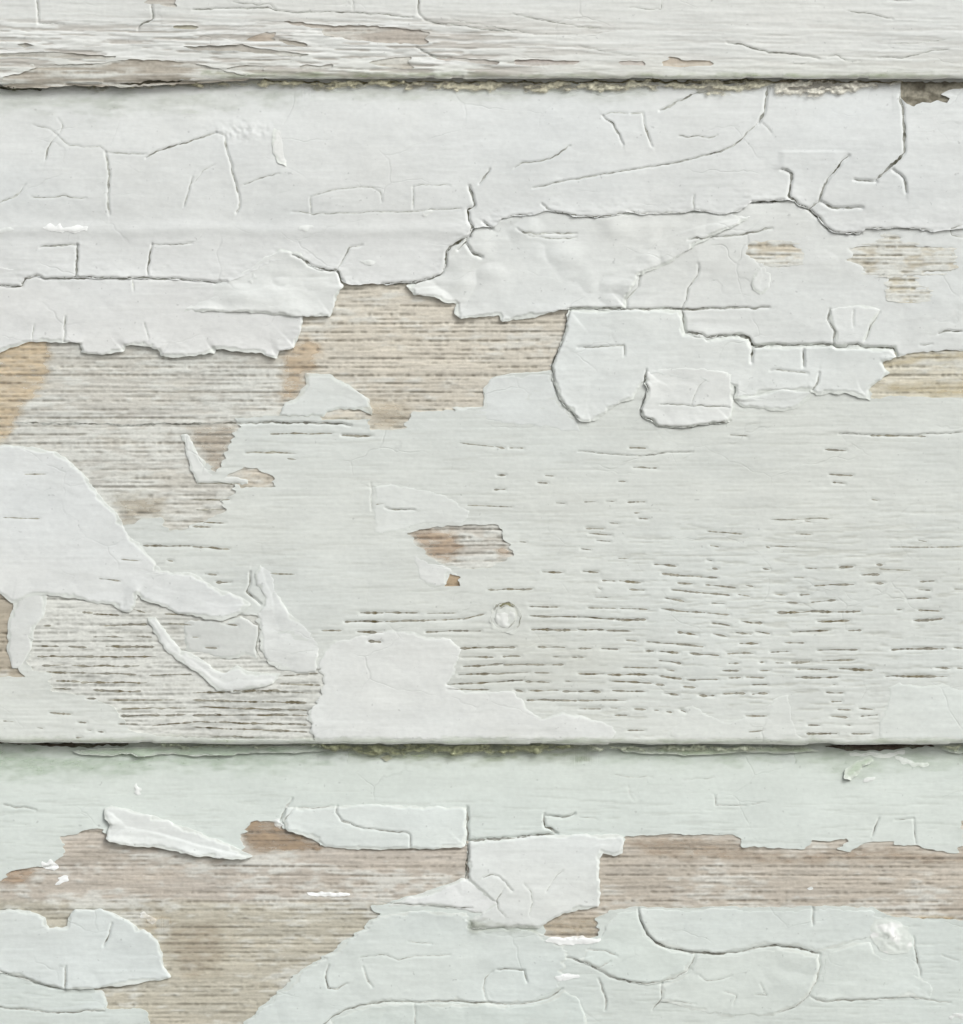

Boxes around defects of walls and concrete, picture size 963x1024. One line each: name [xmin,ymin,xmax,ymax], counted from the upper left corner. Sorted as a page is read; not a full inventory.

crack [0,124,274,213]
crack [292,87,960,285]
crack [0,243,227,288]
crack [551,265,896,418]
peeling [0,200,963,757]
crack [380,900,470,908]
peeling [0,804,963,1024]
crack [324,942,561,1024]
crack [568,915,950,1013]